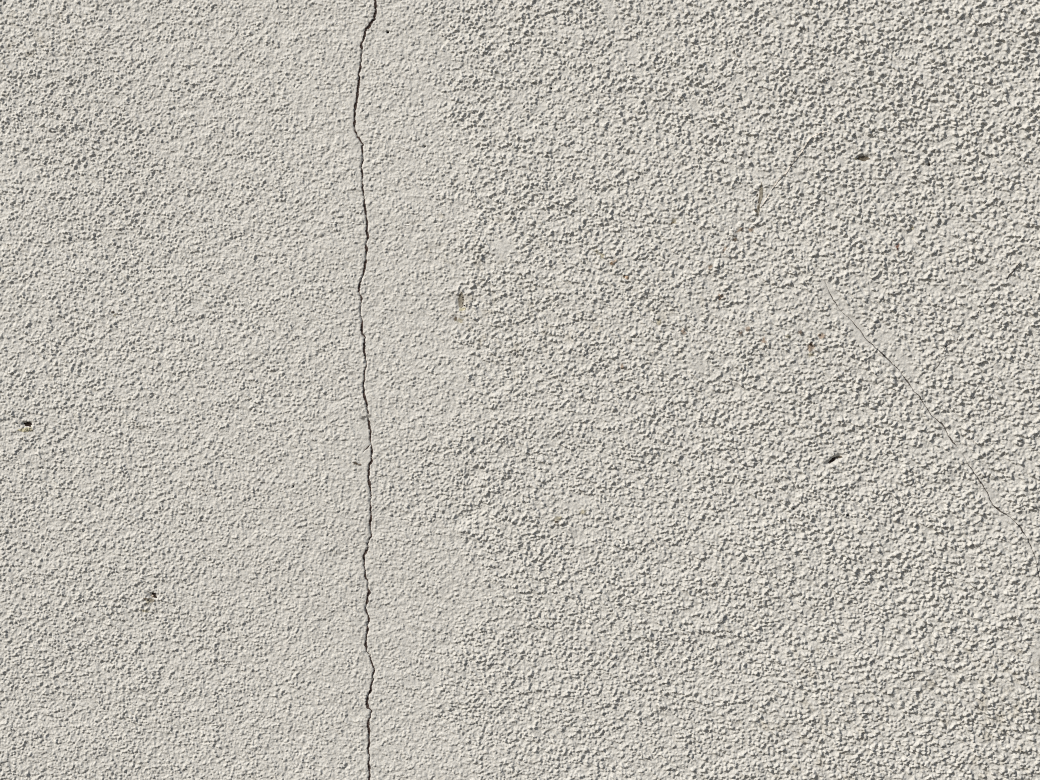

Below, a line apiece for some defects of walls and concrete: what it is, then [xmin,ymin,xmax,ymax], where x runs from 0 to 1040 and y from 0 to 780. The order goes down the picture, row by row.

crack [353,0,377,780]